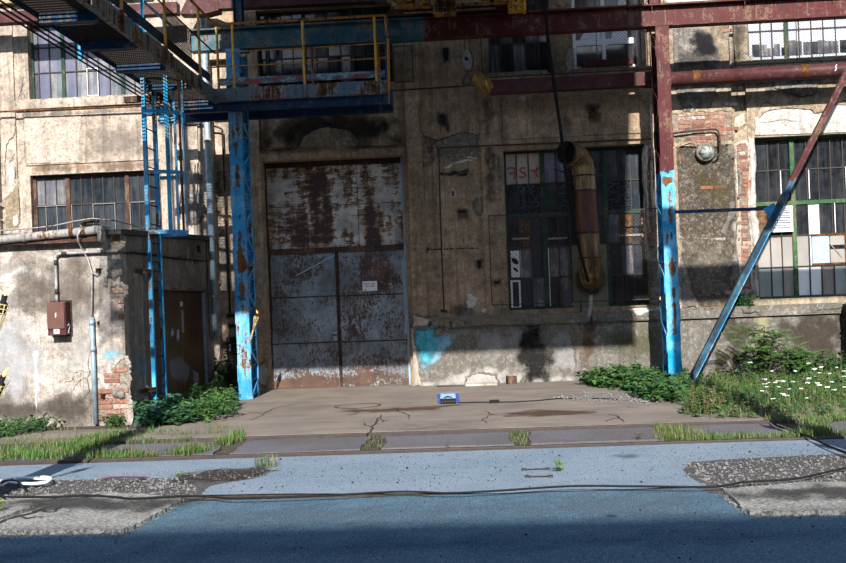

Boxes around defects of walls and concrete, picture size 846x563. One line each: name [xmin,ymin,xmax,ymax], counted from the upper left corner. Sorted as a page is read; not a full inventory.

spalling [421,130,482,167]
spalling [672,79,846,311]
rust [237,231,248,273]
flaking render [96,234,151,426]
water stain [422,333,578,386]
crack [345,405,461,434]